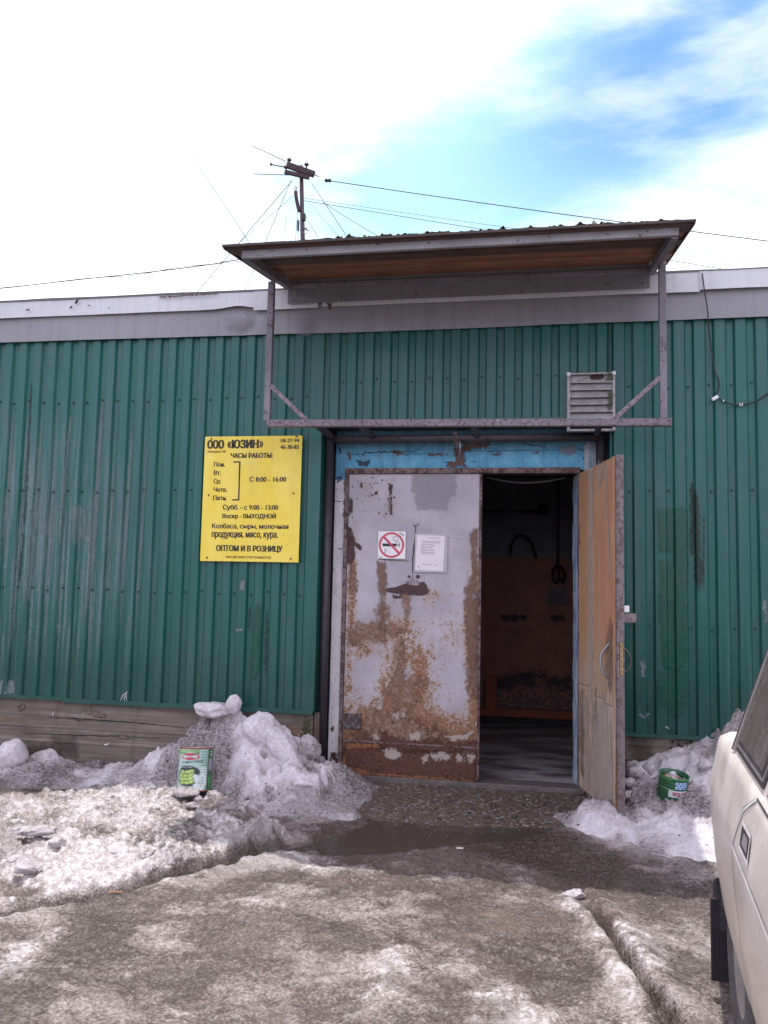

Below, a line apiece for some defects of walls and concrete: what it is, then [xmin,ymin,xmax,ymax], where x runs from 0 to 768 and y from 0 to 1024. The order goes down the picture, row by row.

rust [444,446,476,468]
rust [347,533,362,594]
rust [342,603,480,782]
rust [463,528,478,698]
leakage [658,482,705,716]